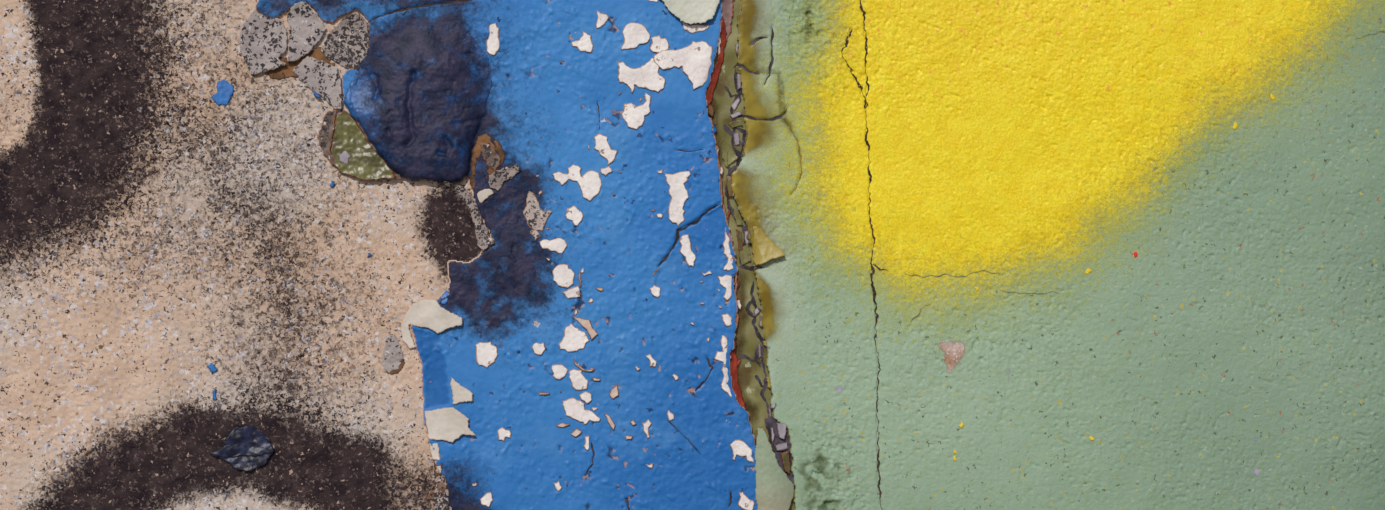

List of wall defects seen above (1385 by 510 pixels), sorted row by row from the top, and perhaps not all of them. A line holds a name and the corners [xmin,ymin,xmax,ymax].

peeling [211,79,234,105]
peeling [237,2,402,188]
spalling [486,23,500,55]
spalling [571,11,609,53]
spalling [618,0,741,175]
peeling [381,291,462,374]
spalling [438,133,651,450]
spalling [652,169,742,397]
crack [841,0,1057,510]
peeling [425,378,476,510]
spalling [472,483,493,508]
peeling [730,377,795,510]